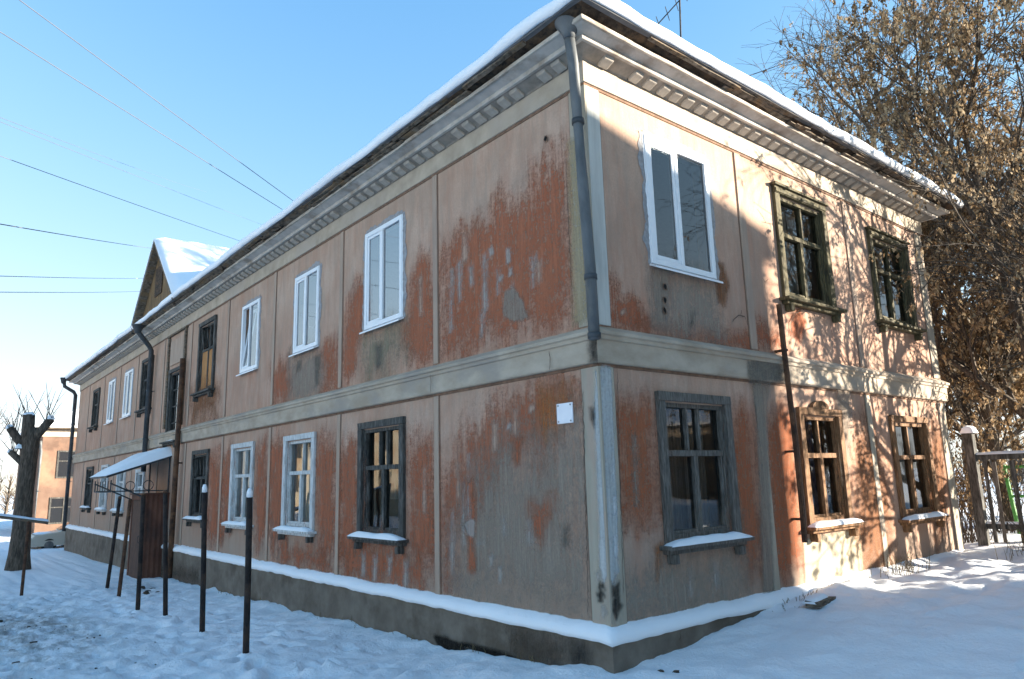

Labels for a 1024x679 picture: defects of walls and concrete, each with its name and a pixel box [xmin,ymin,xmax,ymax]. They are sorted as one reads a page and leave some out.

peeling [402,135,579,368]
peeling [254,373,582,595]